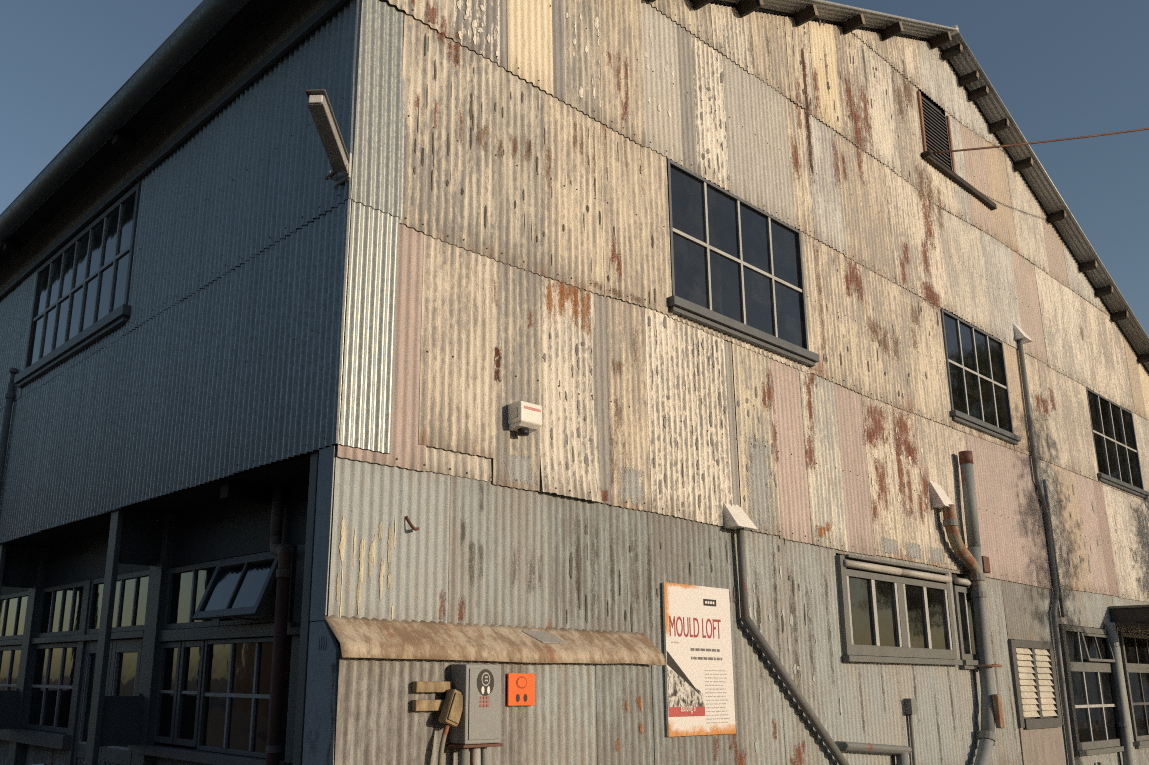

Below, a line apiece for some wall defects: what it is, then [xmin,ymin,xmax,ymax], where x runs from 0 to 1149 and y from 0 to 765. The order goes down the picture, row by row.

peeling [457,0,499,63]
peeling [414,33,464,195]
peeling [470,91,524,147]
corrosion [791,40,820,182]
corrosion [831,77,873,188]
corrosion [528,235,642,334]
peeling [648,277,667,329]
corrosion [815,248,826,364]
corrosion [900,165,943,347]
peeling [559,383,594,470]
peeling [682,329,770,510]
corrosion [862,404,932,521]